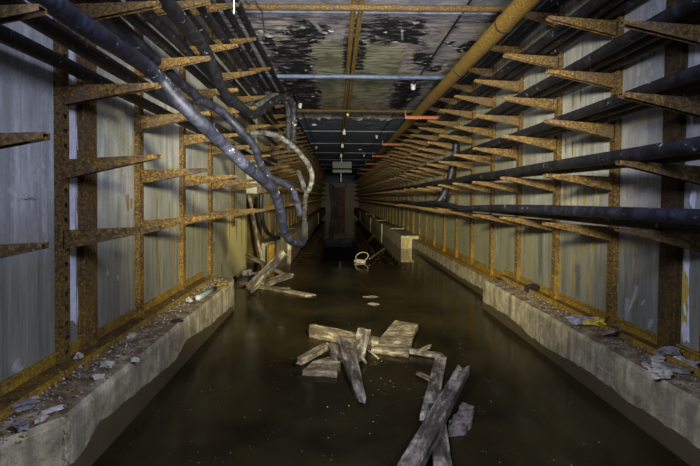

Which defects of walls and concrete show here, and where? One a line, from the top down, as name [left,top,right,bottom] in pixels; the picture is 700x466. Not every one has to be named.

corrosion [227,204,247,275]
peeling [681,248,690,343]